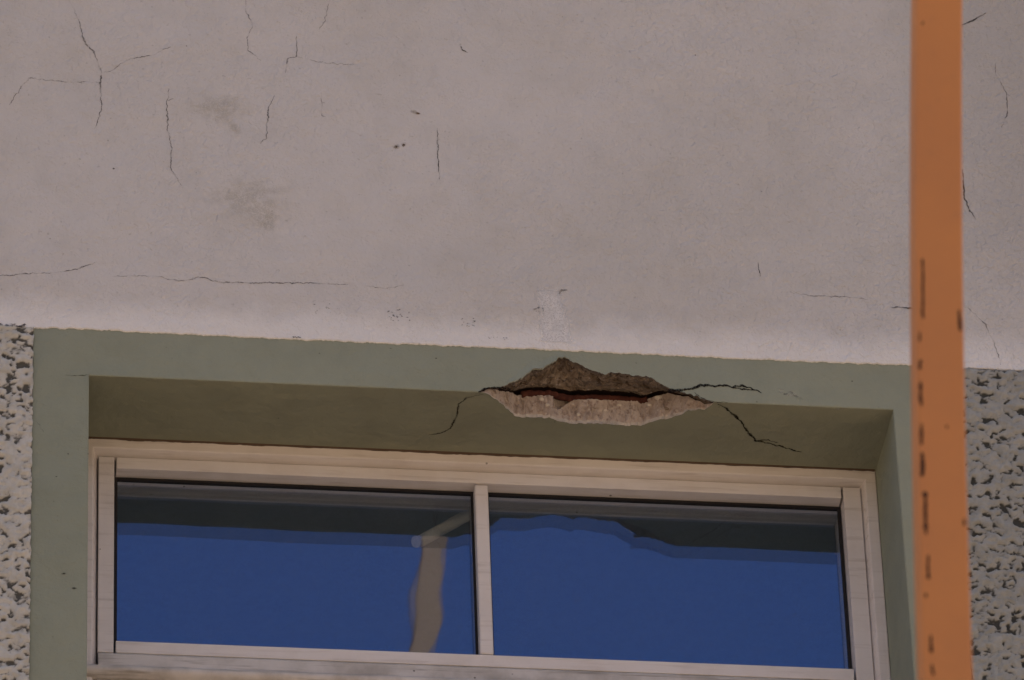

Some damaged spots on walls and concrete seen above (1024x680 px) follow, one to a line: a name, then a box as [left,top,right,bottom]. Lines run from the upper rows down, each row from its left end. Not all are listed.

crack [9,22,167,125]
crack [429,387,511,435]
spalling [483,358,713,426]
crack [668,384,800,452]